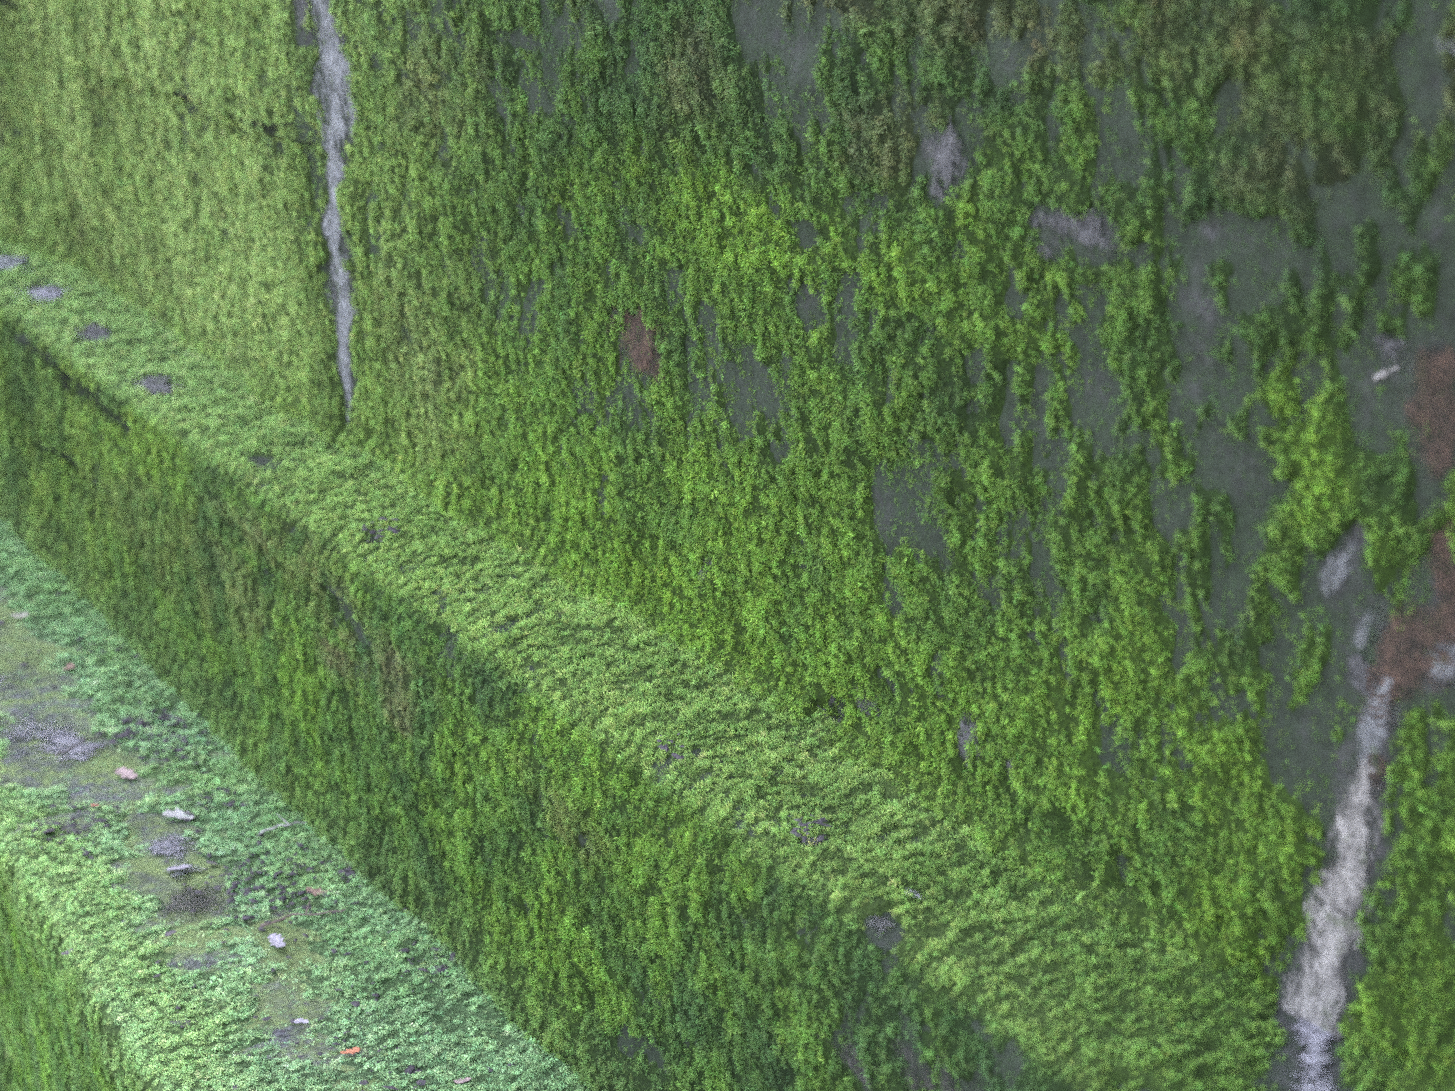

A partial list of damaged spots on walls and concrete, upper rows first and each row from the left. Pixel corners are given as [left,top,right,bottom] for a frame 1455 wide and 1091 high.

corrosion [620,310,665,381]
corrosion [1405,348,1455,480]
corrosion [1359,504,1455,727]
corrosion [1364,753,1388,786]
crack [1281,679,1392,1091]